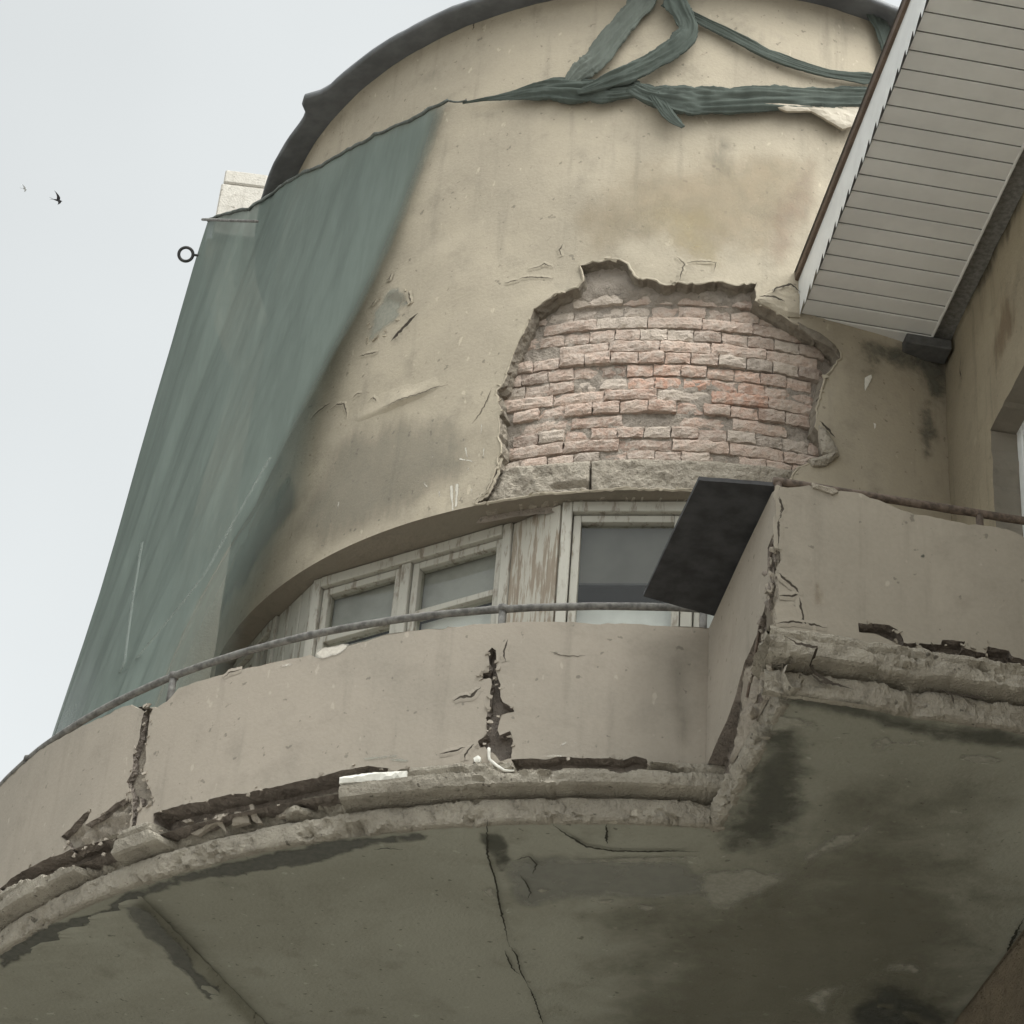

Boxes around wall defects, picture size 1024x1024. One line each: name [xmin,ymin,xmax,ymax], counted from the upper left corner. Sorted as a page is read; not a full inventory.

spalling [474,257,842,523]
spalling [0,703,410,893]
crack [486,818,543,1023]
spalling [475,648,653,773]
crack [555,825,694,852]
spalling [708,534,790,774]
leakage [732,715,808,847]
crack [773,485,851,689]
leakage [787,698,1024,747]
spalling [858,620,1024,666]